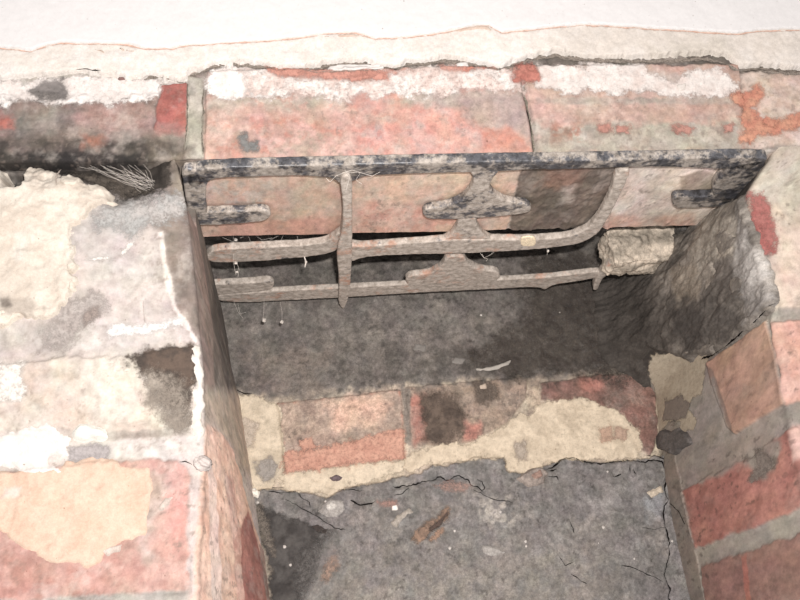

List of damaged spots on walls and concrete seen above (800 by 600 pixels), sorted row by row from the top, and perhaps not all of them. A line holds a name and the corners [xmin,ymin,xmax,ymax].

flaking render [0,167,118,329]
leakage [143,368,192,433]
crack [269,487,342,530]
crack [394,475,512,503]
crack [548,455,685,600]